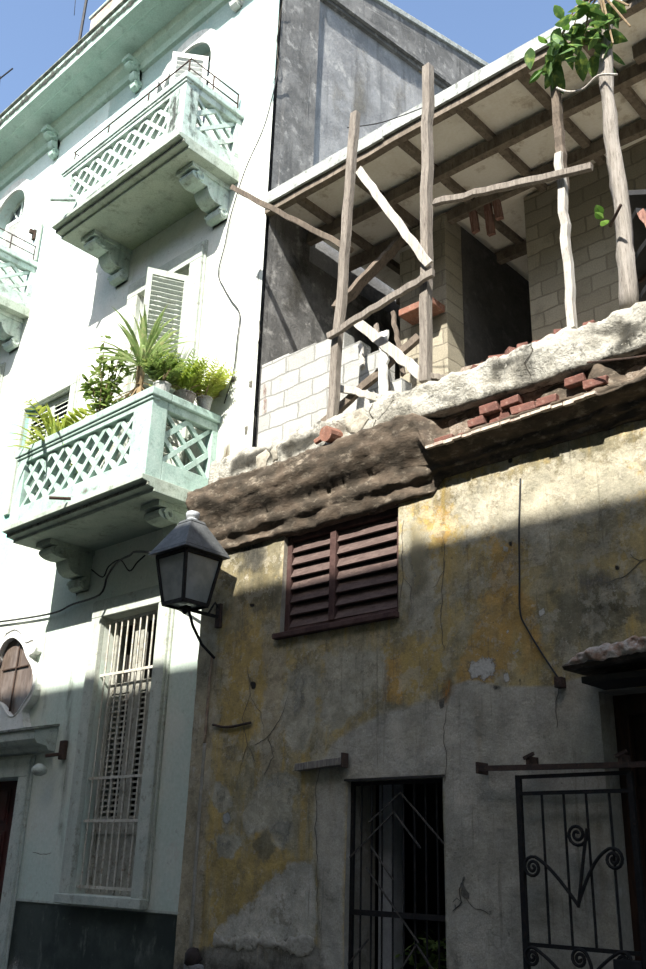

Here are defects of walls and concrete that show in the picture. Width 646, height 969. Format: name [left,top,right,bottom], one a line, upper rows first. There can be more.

spalling [470,340,539,369]
flaking render [425,355,646,450]
flaking render [344,408,369,433]